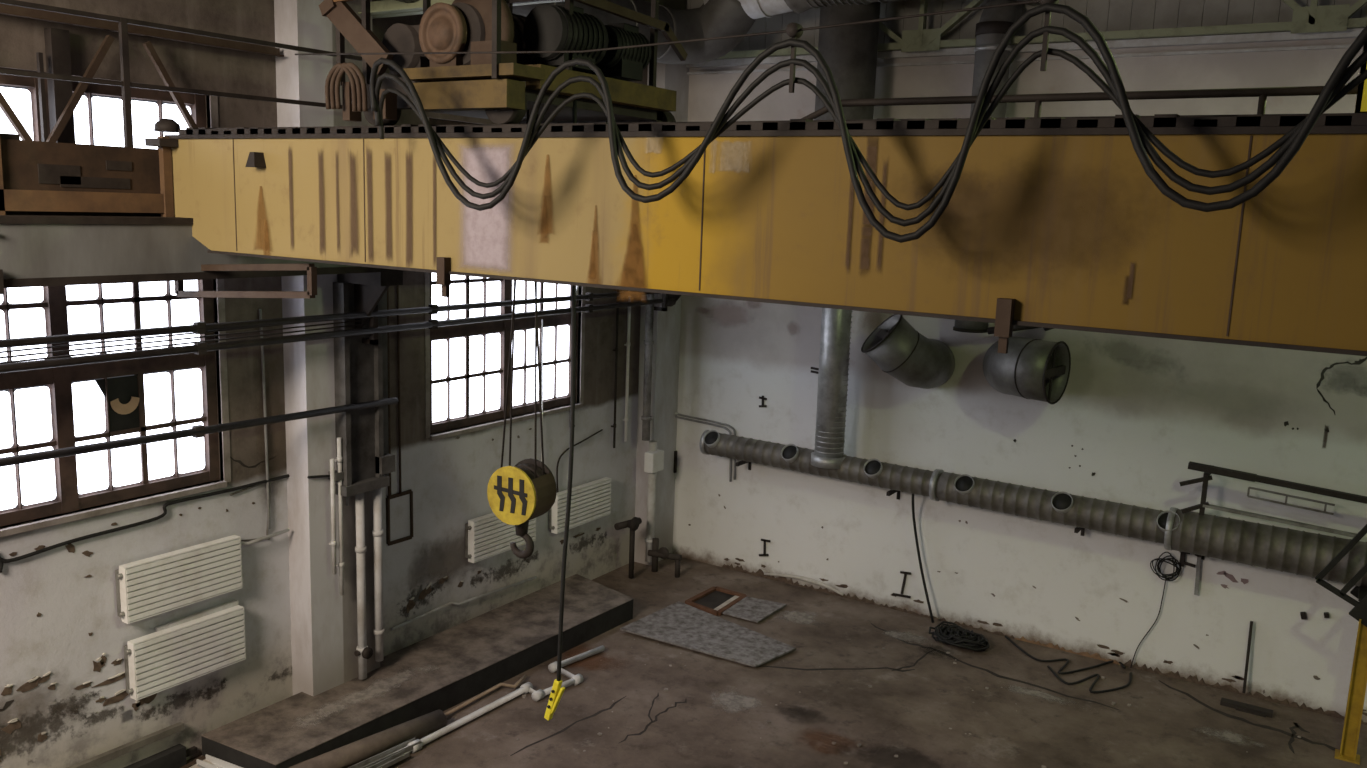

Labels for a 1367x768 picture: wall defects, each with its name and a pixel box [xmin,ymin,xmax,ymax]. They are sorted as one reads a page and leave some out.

crack [1316,357,1367,414]
peeling [406,570,482,613]
peeling [1,671,57,696]
peeling [74,653,157,711]
crack [510,693,687,756]